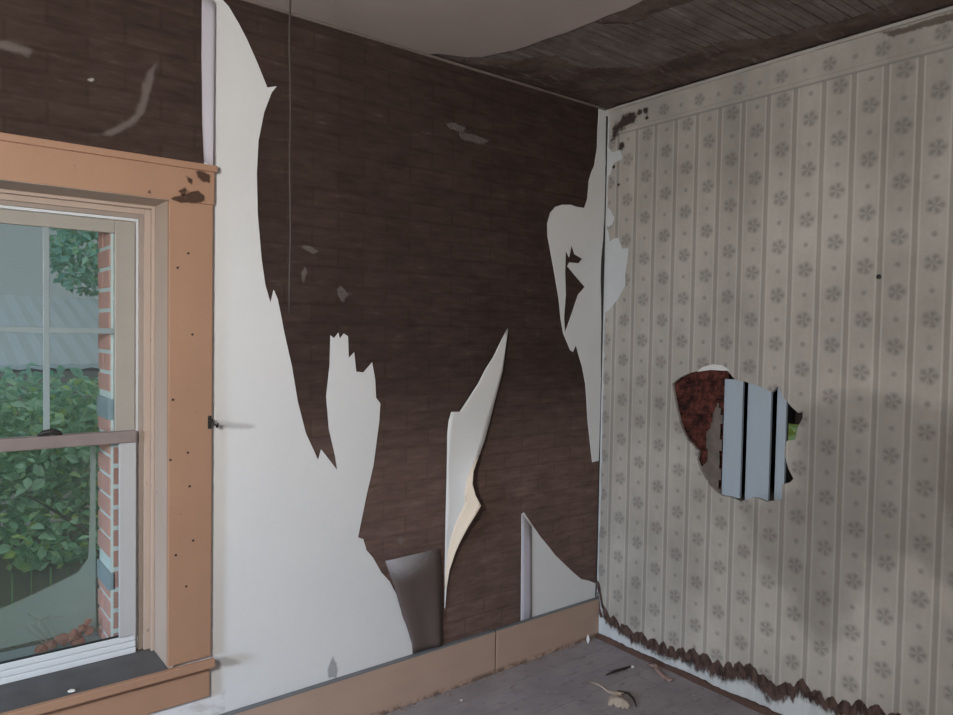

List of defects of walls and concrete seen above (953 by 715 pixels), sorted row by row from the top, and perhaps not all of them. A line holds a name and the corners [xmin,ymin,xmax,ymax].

flaking render [0,0,210,203]
flaking render [223,0,953,644]